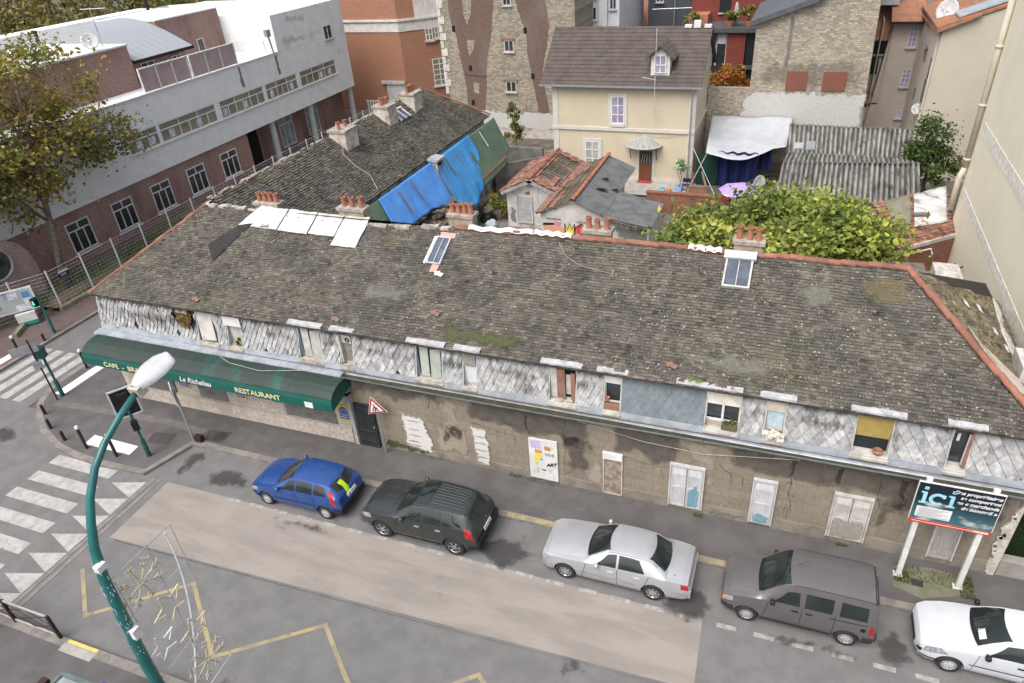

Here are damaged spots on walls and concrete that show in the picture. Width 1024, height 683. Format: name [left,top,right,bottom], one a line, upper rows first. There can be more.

leakage [441,400,488,465]
crack [779,458,812,519]